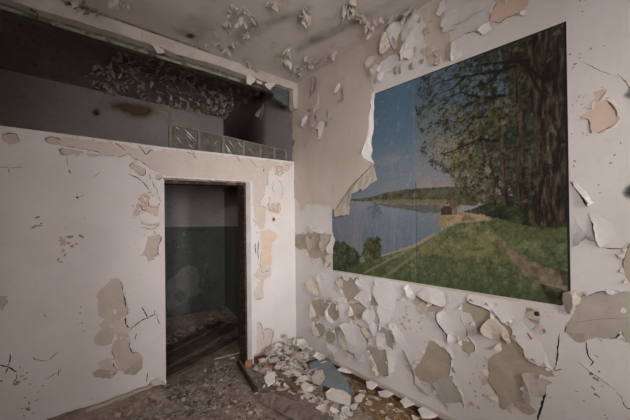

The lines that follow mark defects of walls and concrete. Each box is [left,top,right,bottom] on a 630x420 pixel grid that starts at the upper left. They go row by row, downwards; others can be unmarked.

peeling [41,0,529,301]
peeling [572,87,623,136]
peeling [93,278,167,386]
peeling [315,390,420,420]
peeling [295,181,630,415]
crack [537,333,564,420]
crack [578,342,630,409]